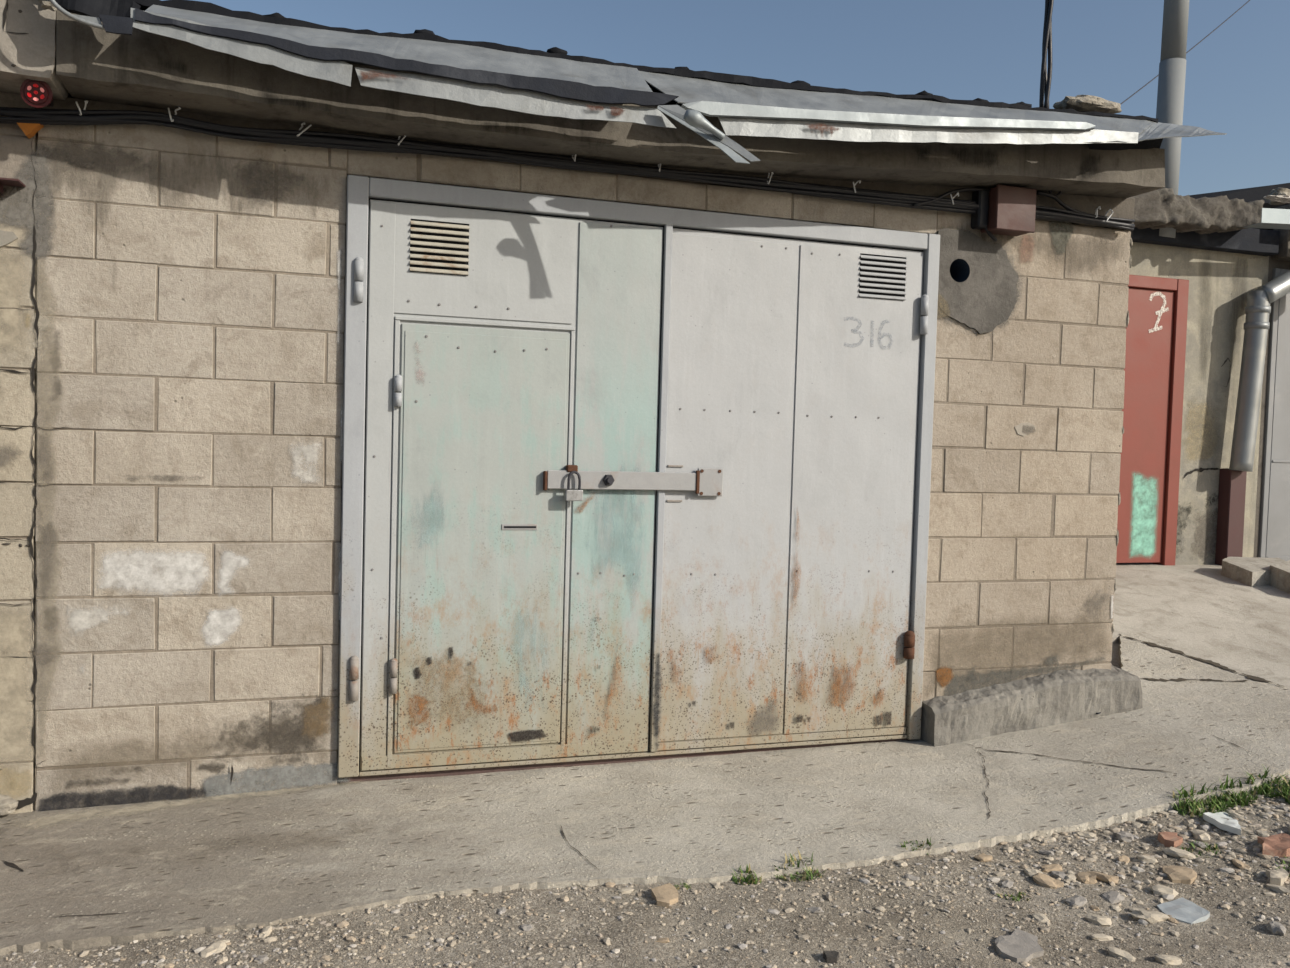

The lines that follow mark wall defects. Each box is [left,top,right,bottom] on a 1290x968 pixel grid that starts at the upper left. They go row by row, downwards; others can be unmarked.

crack [3,0,29,34]
crack [0,142,69,809]
water stain [101,551,249,594]
water stain [203,608,240,645]
crack [1123,636,1282,686]
corrosion [410,647,495,722]
corrosion [877,690,891,725]
water stain [222,699,324,761]
corrosion [509,730,547,741]
water stain [199,756,225,772]
crack [965,743,1176,818]
crack [3,860,24,871]